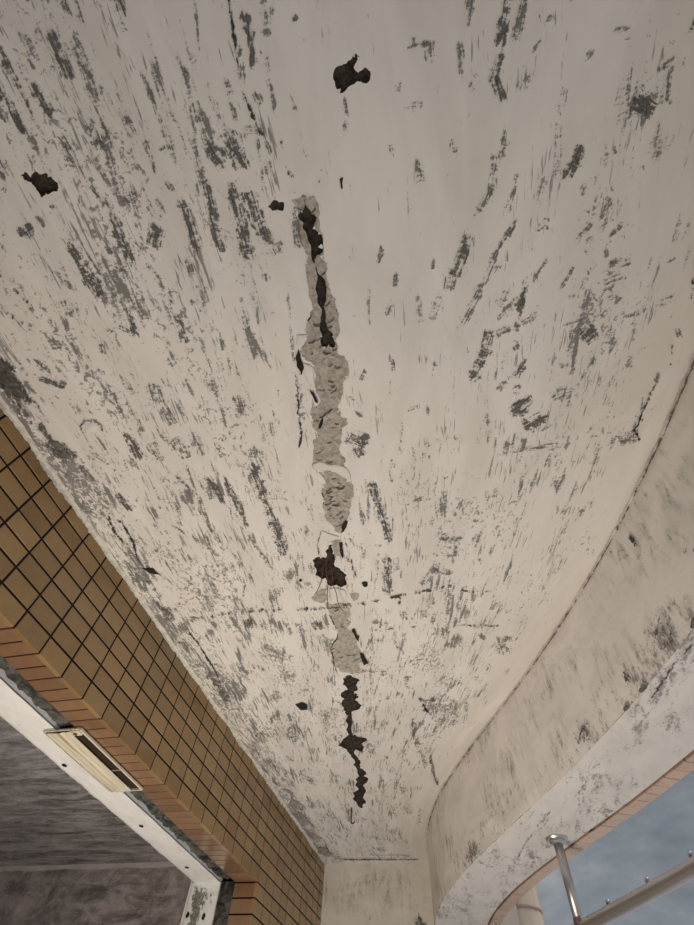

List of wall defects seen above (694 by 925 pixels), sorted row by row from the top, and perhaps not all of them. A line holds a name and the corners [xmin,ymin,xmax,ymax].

spalling [333,54,371,94]
spalling [21,172,59,197]
peeling [0,358,79,464]
crack [295,381,314,448]
spalling [313,545,347,587]
crack [175,585,492,678]
crack [337,345,694,861]